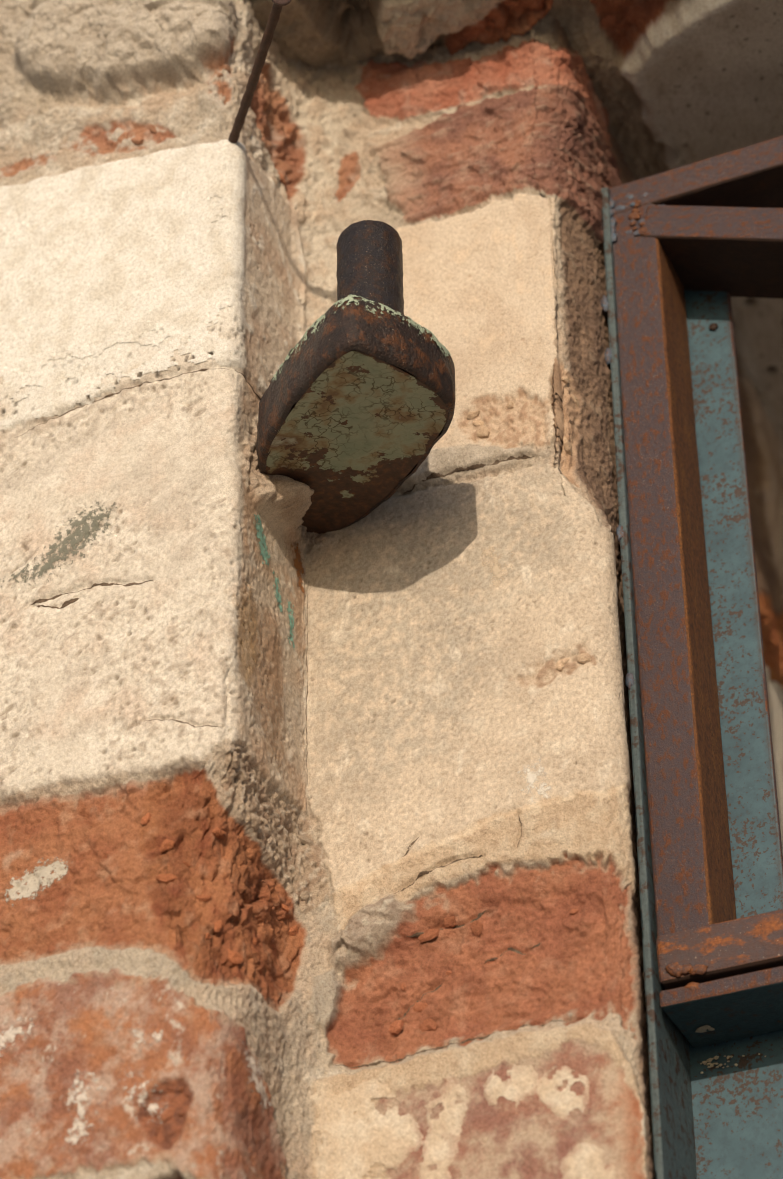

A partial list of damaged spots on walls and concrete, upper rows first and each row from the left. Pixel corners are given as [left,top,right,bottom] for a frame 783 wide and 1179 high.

spalling [445,0,554,55]
flaking render [589,0,783,171]
flaking render [731,297,783,444]
crack [404,455,534,494]
crack [31,580,153,609]
spalling [137,742,331,993]
spalling [360,888,611,1058]